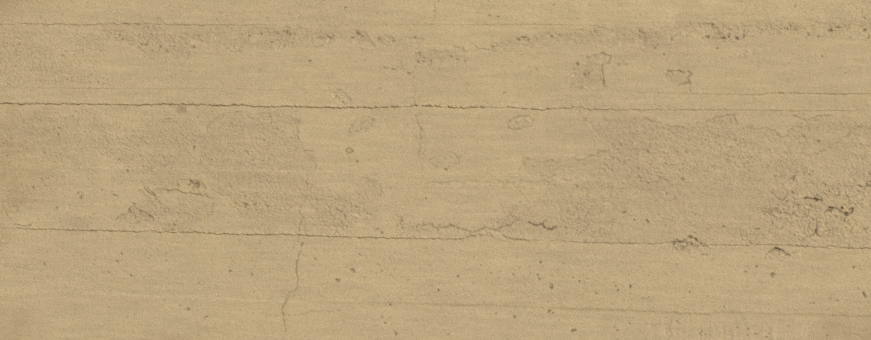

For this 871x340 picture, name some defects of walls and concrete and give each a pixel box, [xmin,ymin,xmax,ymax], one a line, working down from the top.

crack [262,148,360,340]